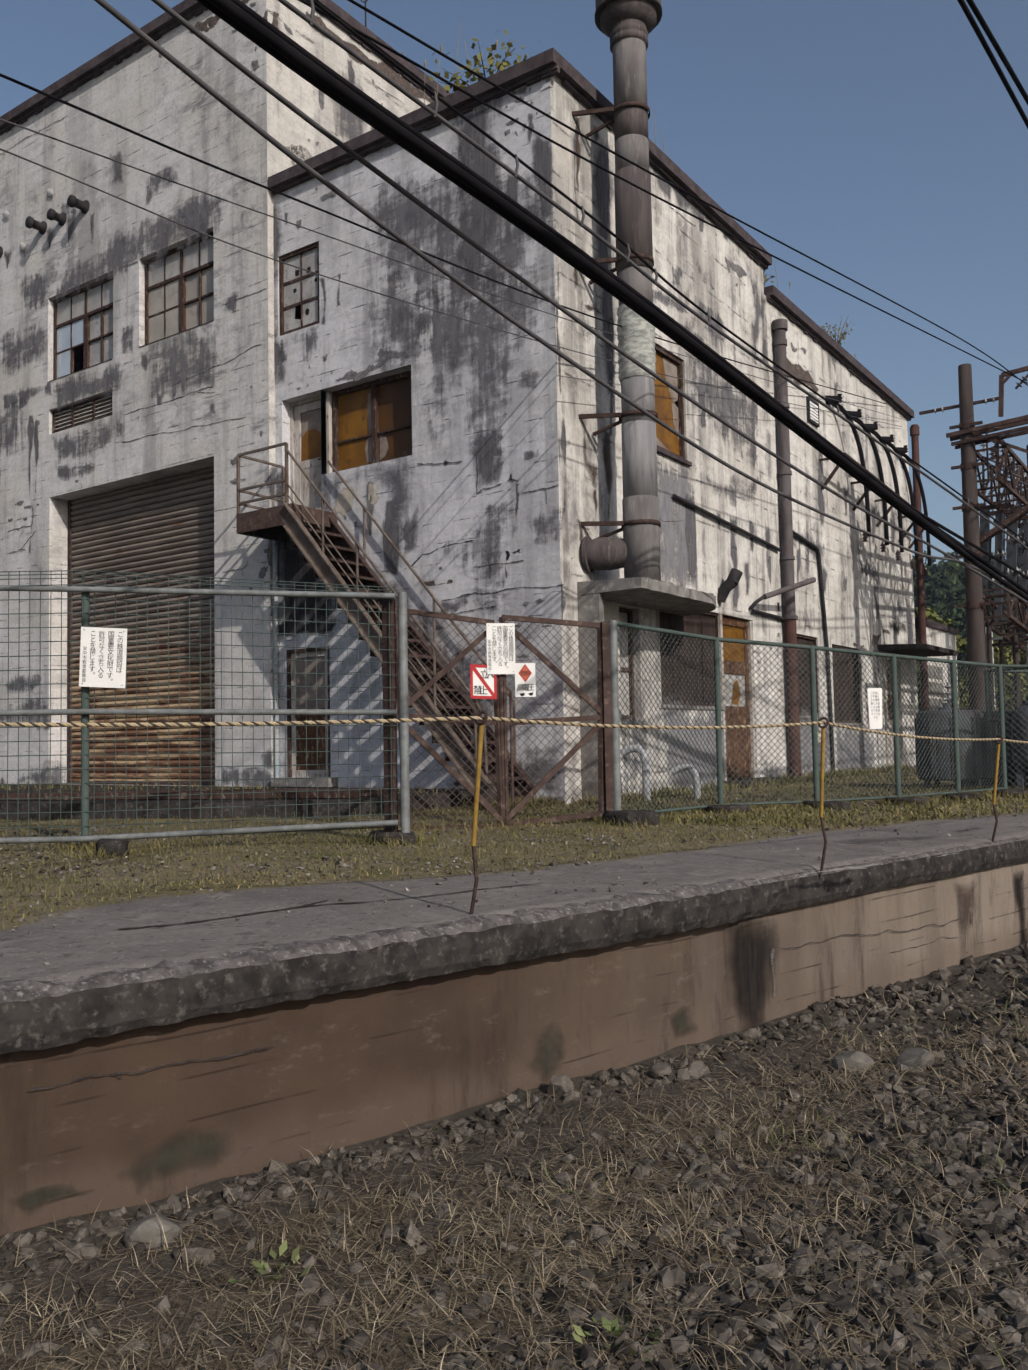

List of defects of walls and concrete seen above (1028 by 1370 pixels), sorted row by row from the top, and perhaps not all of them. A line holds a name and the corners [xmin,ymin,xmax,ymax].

peeling [189,16,237,34]
spalling [242,0,292,35]
peeling [306,12,435,105]
leakage [459,86,556,229]
leakage [593,143,614,269]
leakage [142,330,216,404]
leakage [374,178,561,484]
leakage [602,289,615,435]
leakage [0,365,122,492]
crack [117,882,546,930]
leakage [1015,875,1027,945]
leakage [732,925,775,1026]